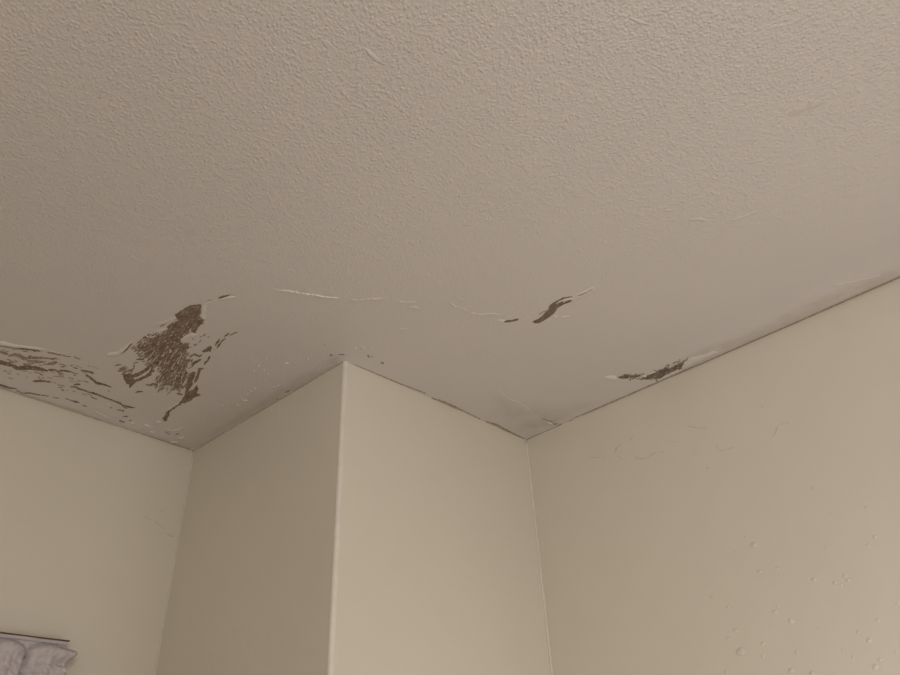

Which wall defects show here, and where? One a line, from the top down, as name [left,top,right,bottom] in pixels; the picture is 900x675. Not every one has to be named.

peeling [0,341,134,422]
peeling [106,294,237,422]
crack [127,276,900,451]